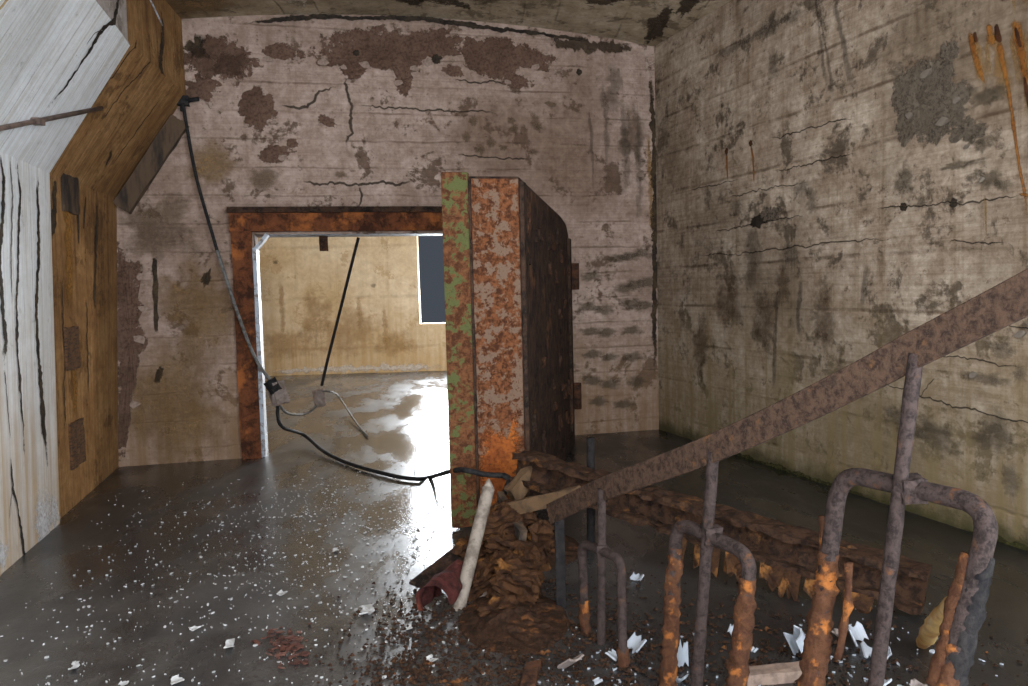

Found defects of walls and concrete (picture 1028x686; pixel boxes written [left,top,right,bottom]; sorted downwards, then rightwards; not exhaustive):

spalling [397,0,471,10]
crack [54,0,119,99]
flaking render [183,24,557,132]
crack [283,79,488,142]
rust [968,21,1028,201]
flaking render [253,138,298,186]
crack [308,172,408,205]
crack [882,196,1015,209]
crack [951,238,1001,246]
water stain [131,202,233,459]
crack [944,355,1012,367]
crack [888,380,1028,423]